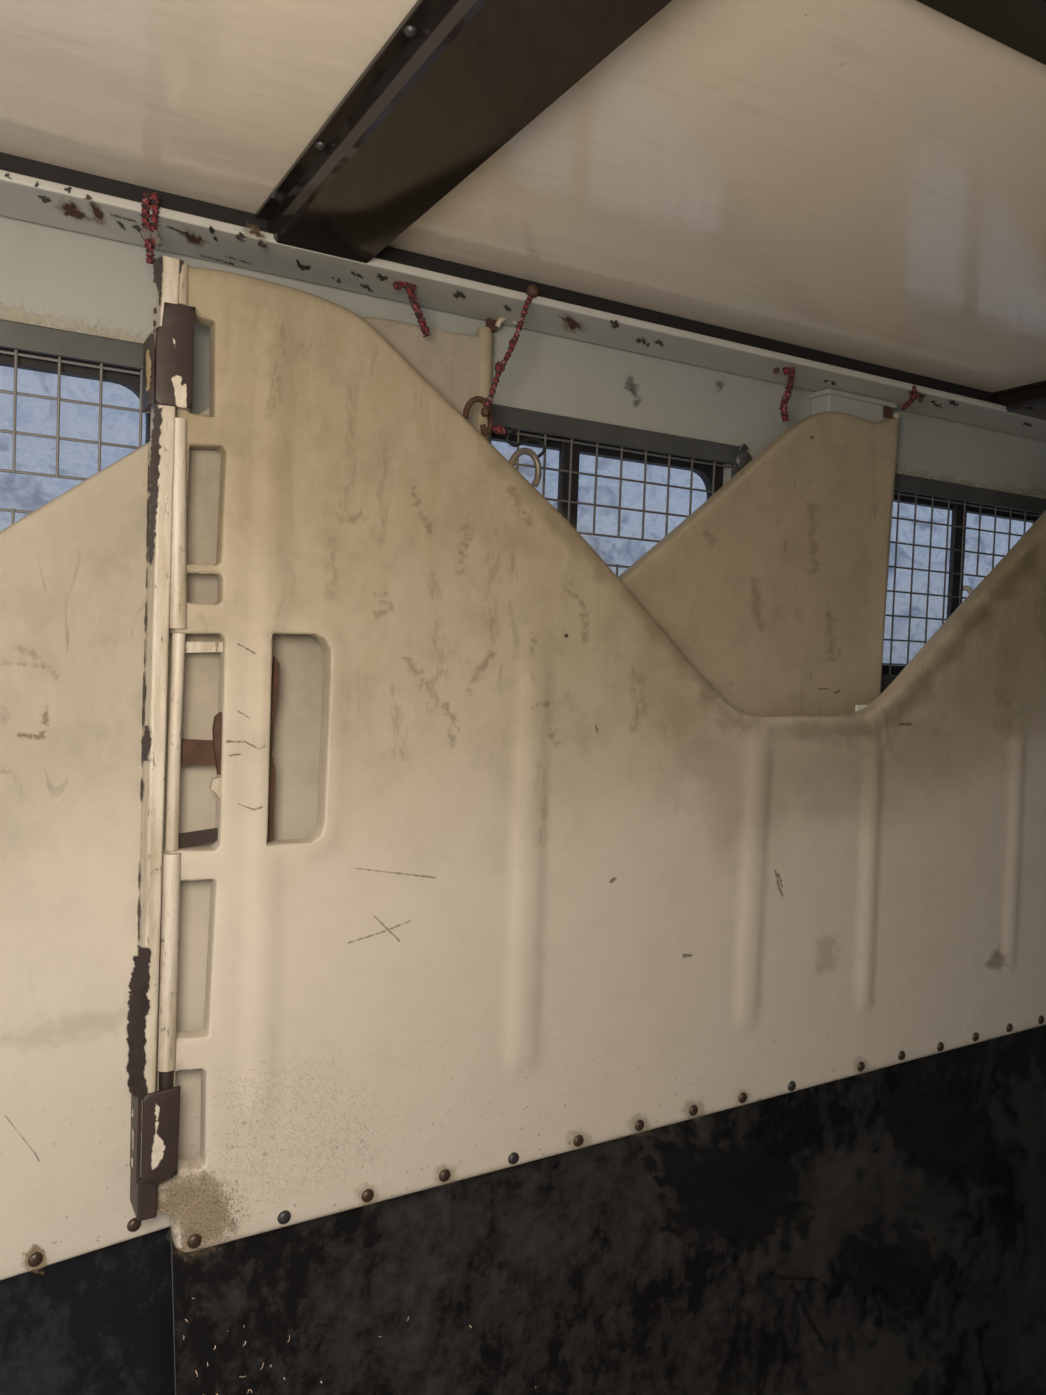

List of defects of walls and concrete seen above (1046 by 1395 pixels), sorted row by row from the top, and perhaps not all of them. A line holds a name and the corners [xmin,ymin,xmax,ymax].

rust [35,182,141,233]
rust [167,225,248,265]
rust [235,228,267,248]
peeling [153,256,162,333]
rust [332,271,387,293]
rust [908,390,959,409]
peeling [140,375,187,800]
peeling [126,873,165,1169]